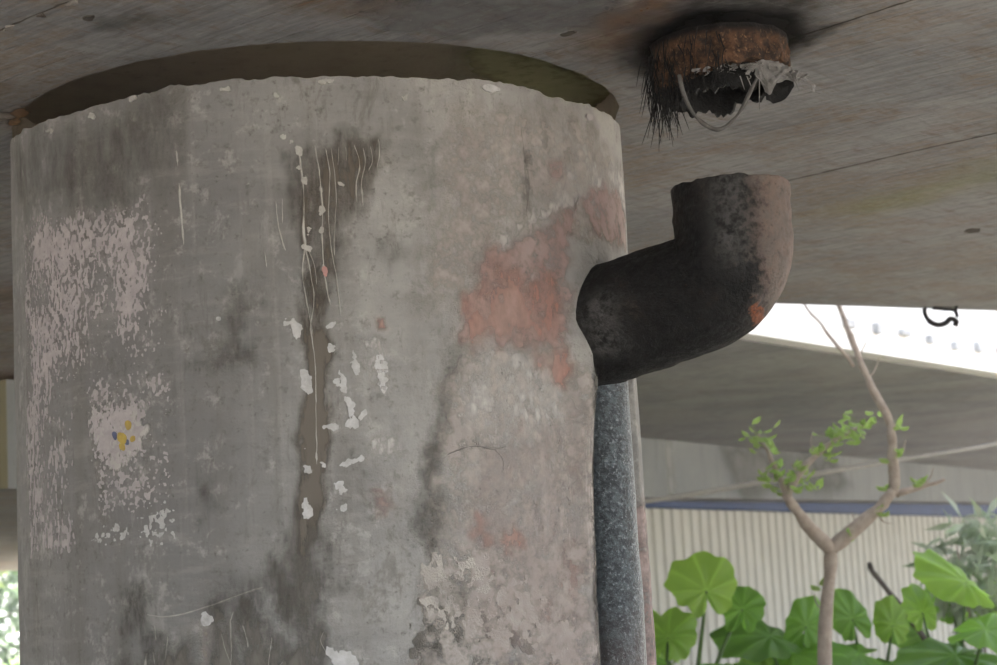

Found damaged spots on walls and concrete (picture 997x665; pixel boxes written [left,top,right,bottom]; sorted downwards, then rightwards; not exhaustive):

peeling [283,318,303,340]
peeling [23,194,178,560]
leakage [202,133,380,665]
peeling [300,369,313,394]
peeling [322,350,367,431]
peeling [374,354,388,394]
peeling [339,455,364,467]
peeling [302,498,313,519]
peeling [334,481,348,512]
spalling [409,349,598,665]